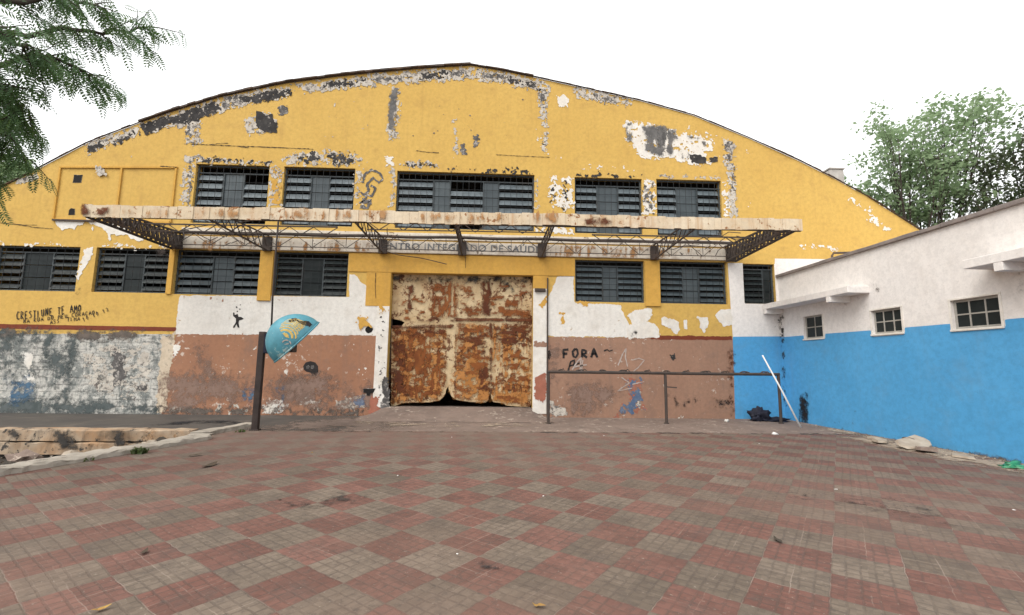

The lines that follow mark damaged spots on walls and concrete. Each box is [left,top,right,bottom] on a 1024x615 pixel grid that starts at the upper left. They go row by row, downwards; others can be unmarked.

peeling [183,120,204,146]
spalling [244,105,289,137]
peeling [385,86,416,141]
spalling [623,120,749,218]
peeling [24,353,35,381]
peeling [79,339,160,408]
corrosion [390,275,532,405]
peeling [626,308,733,343]